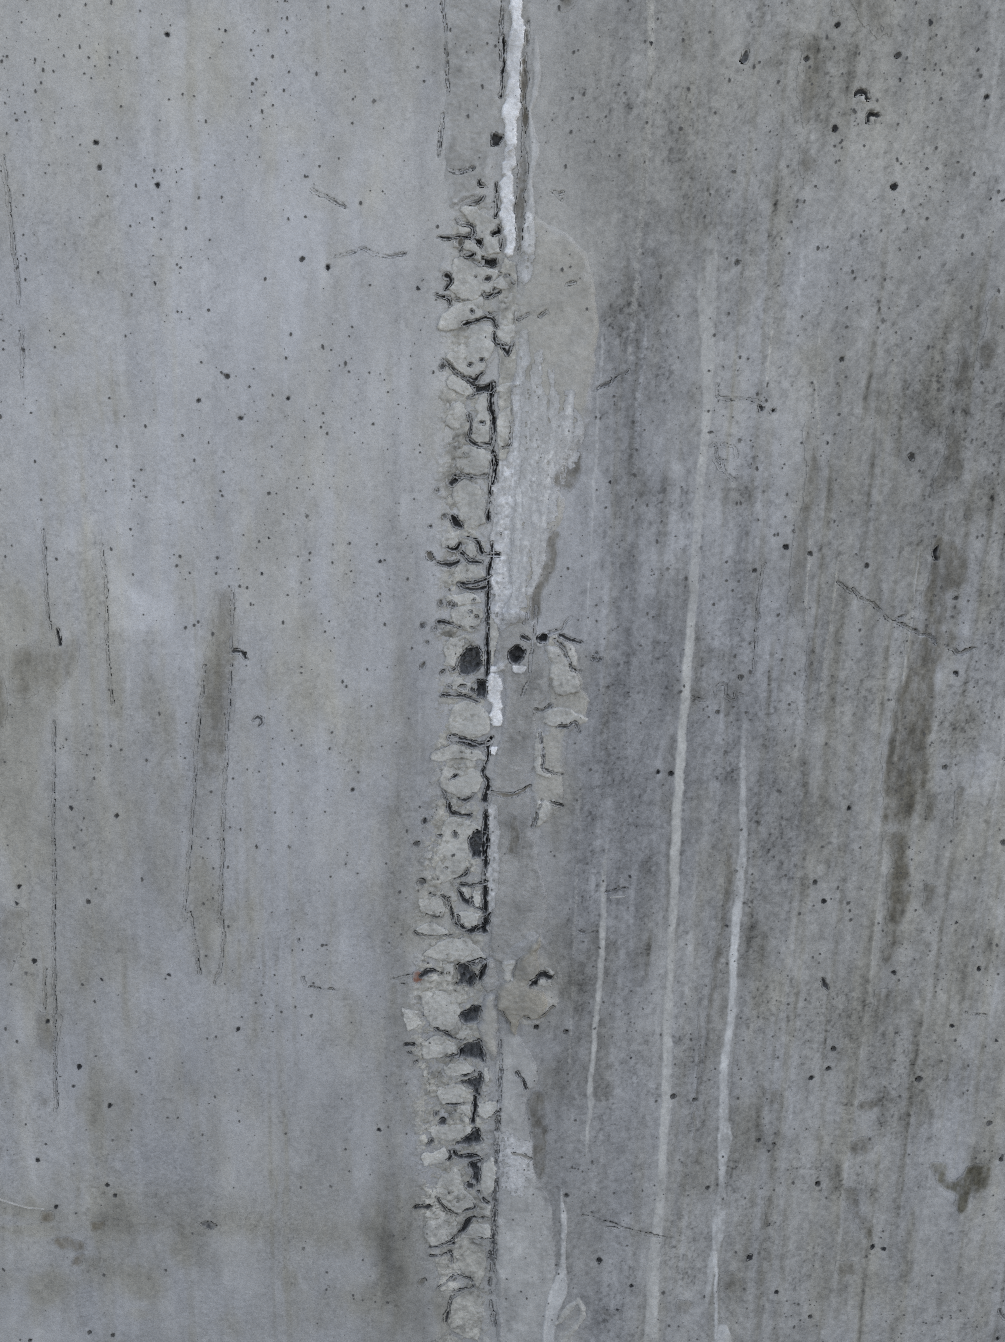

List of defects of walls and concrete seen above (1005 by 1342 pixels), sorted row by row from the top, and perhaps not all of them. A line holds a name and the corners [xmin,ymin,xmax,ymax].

crack [491,131,504,147]
crack [498,35,507,98]
crack [484,382,498,678]
spalling [402,167,549,1342]
crack [480,735,494,915]
spalling [520,611,603,828]
damp [643,216,719,1342]
damp [880,534,971,965]
damp [584,835,608,1159]
damp [676,704,749,1342]
crack [488,1039,528,1328]
damp [930,1162,993,1215]